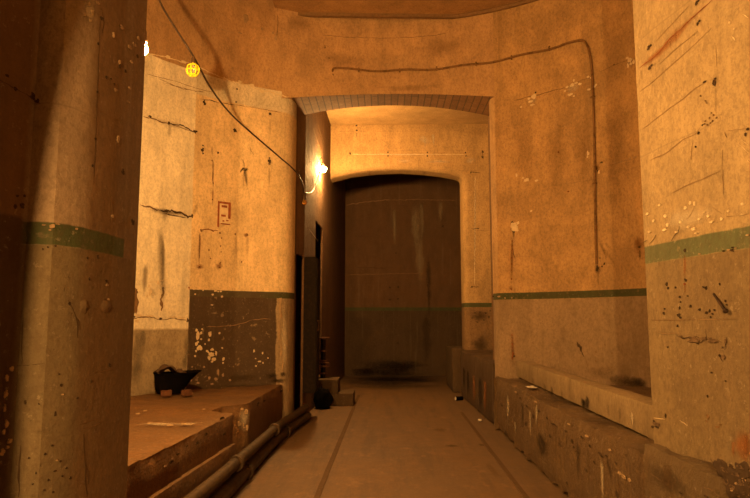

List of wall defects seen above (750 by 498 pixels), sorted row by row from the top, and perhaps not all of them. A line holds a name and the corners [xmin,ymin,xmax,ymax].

rust [640,0,712,68]
crack [134,314,189,323]
peeling [194,328,231,385]